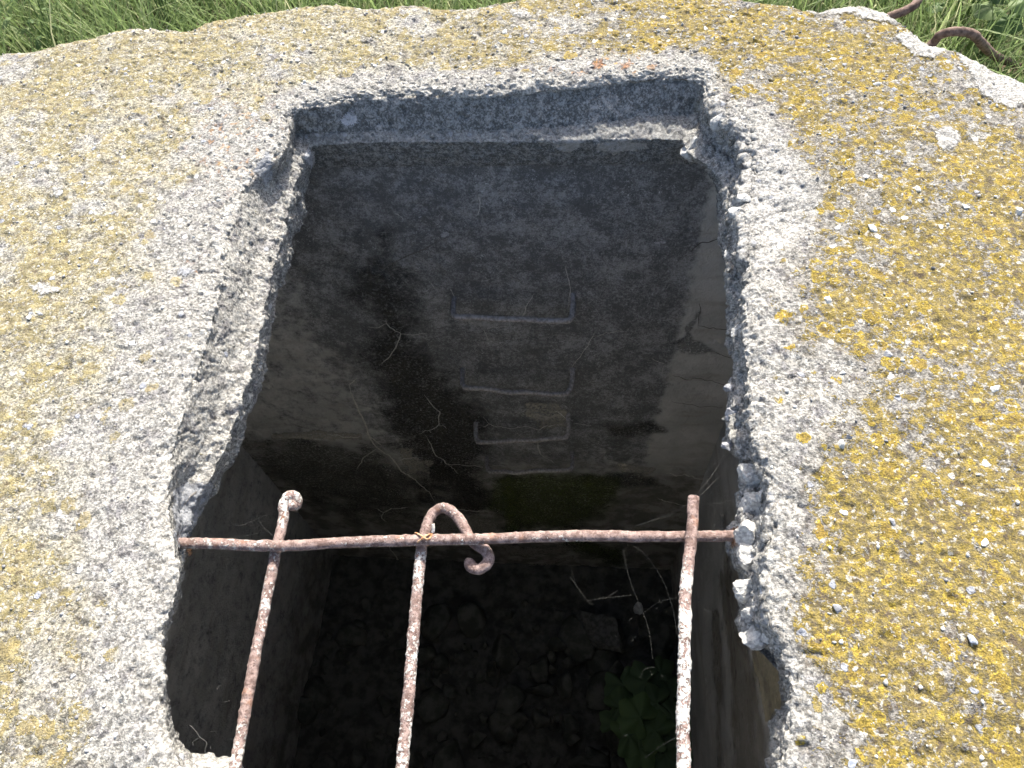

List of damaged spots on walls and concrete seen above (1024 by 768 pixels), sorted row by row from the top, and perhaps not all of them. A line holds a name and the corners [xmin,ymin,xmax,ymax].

leakage [244,230,621,566]
spalling [171,481,215,554]
spalling [725,462,788,657]